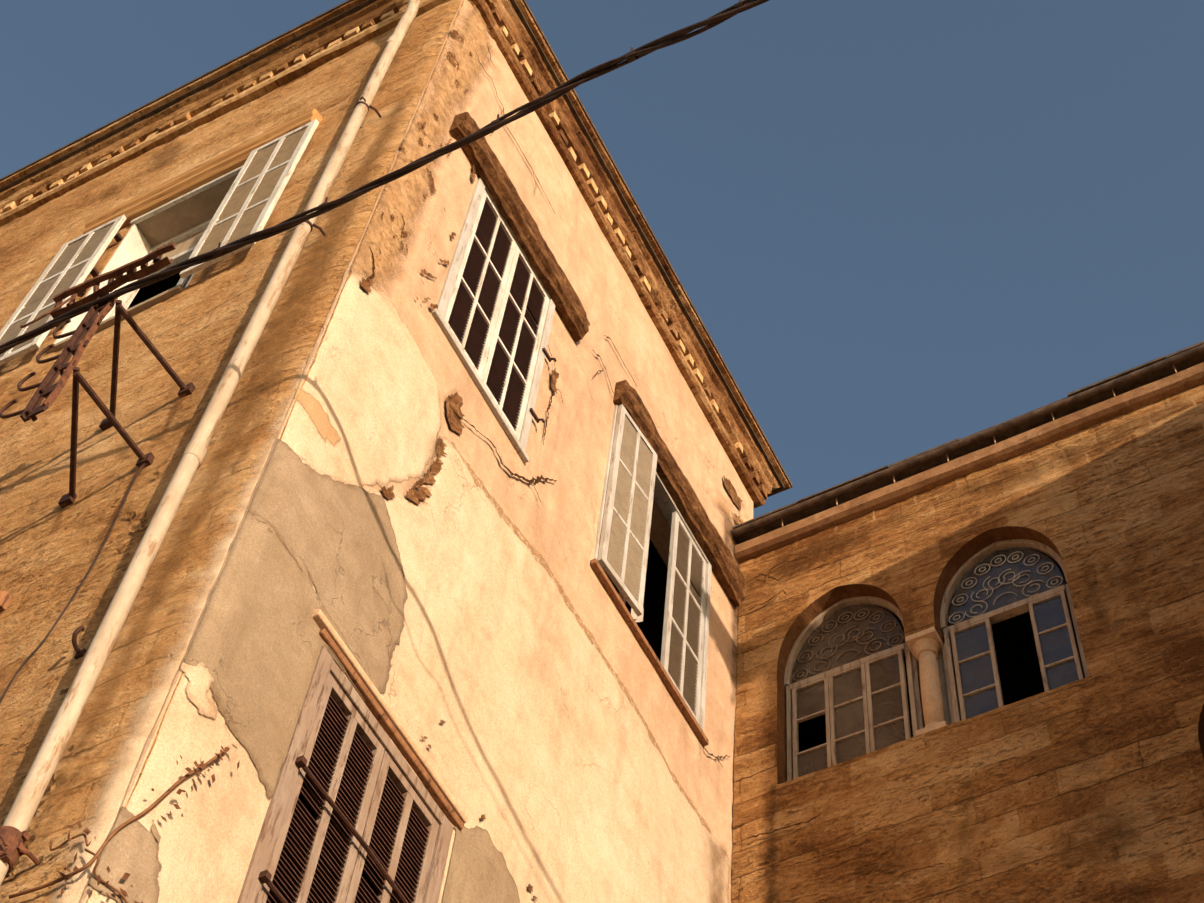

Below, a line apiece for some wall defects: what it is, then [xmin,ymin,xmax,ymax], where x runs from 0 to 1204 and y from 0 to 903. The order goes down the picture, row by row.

crack [543,346,563,445]
crack [593,335,637,396]
spalling [381,392,466,504]
crack [452,408,557,503]